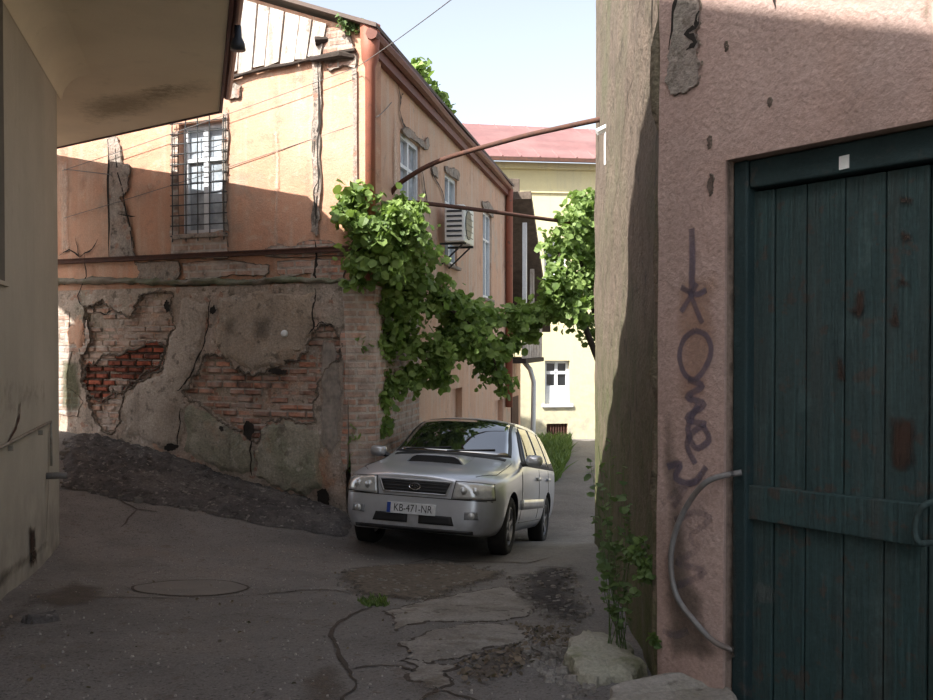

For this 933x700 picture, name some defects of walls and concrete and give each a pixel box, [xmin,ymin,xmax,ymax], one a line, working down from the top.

flaking render [664,0,703,97]
flaking render [58,27,357,444]
crack [309,69,333,334]
crack [177,300,217,445]
crack [192,589,416,700]
crack [419,687,478,700]